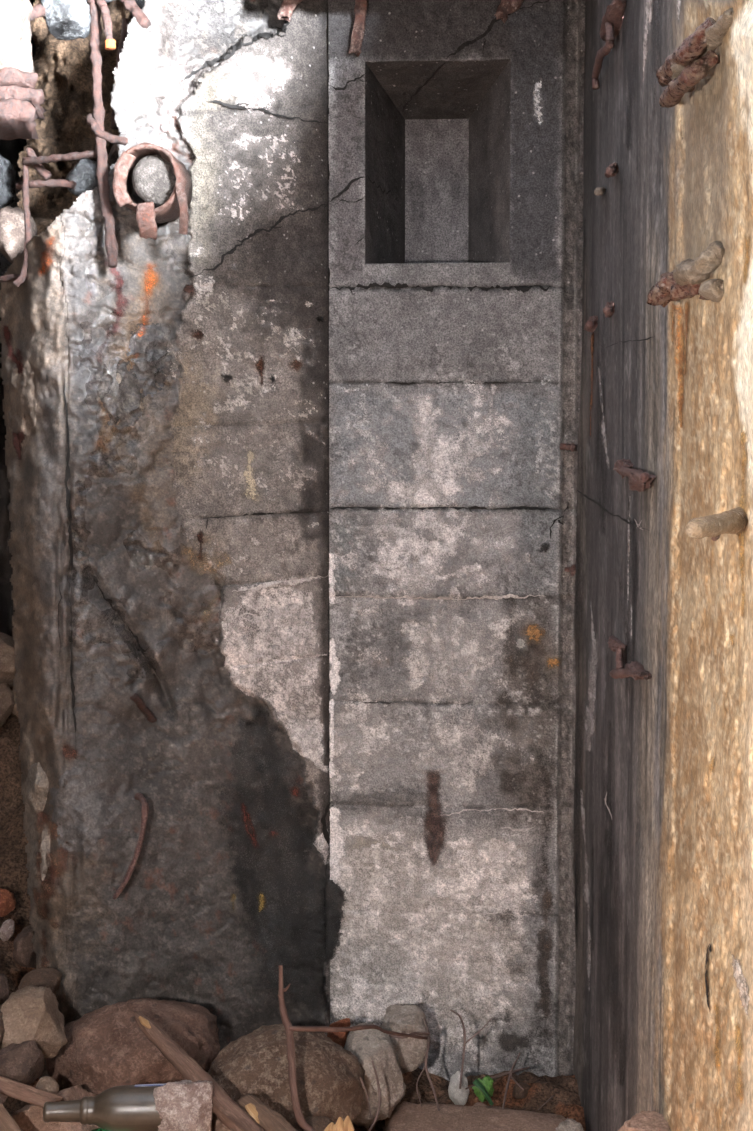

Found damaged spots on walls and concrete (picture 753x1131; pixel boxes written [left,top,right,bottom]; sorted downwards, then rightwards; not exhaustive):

rust [112,143,193,240]
rust [3,326,24,376]
rust [99,259,129,361]
rust [145,264,157,295]
crack [178,0,647,876]
leakage [580,367,610,530]
leakage [620,500,638,660]
leakage [218,376,558,1067]
rust [424,770,446,865]
leakage [574,510,626,1084]